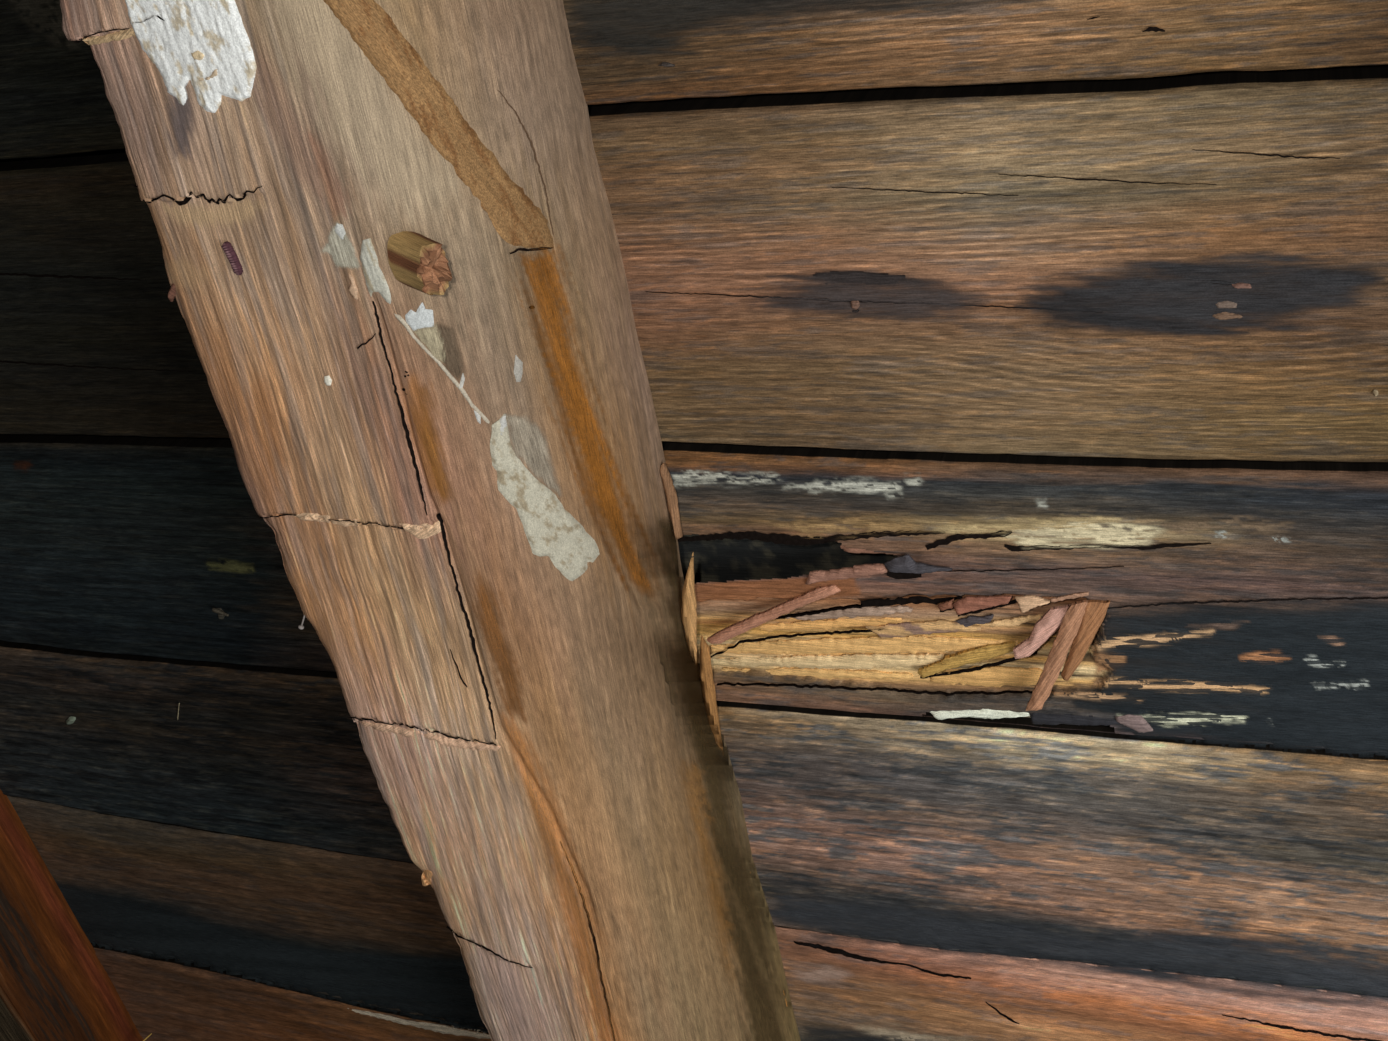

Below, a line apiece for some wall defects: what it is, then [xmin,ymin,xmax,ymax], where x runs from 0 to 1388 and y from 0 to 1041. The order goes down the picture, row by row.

peeling [125,0,257,113]
crack [131,184,262,206]
leakage [766,273,972,317]
leakage [1025,256,1376,334]
peeling [323,223,600,581]
crack [258,301,497,745]
spalling [678,534,952,585]
peeling [866,592,1089,639]
peeling [930,709,1153,733]
crack [560,841,616,1041]